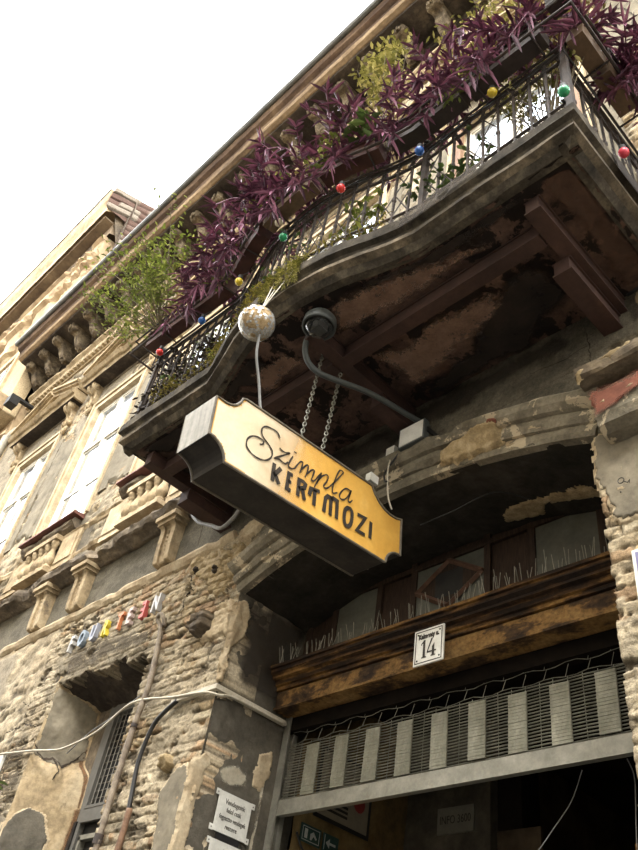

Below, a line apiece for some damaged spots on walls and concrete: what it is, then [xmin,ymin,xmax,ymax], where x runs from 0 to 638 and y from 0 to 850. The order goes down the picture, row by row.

peeling [589,371,638,414]
peeling [439,418,505,467]
peeling [502,433,638,526]
peeling [252,752,273,792]
peeling [151,753,211,850]
spalling [0,807,51,850]